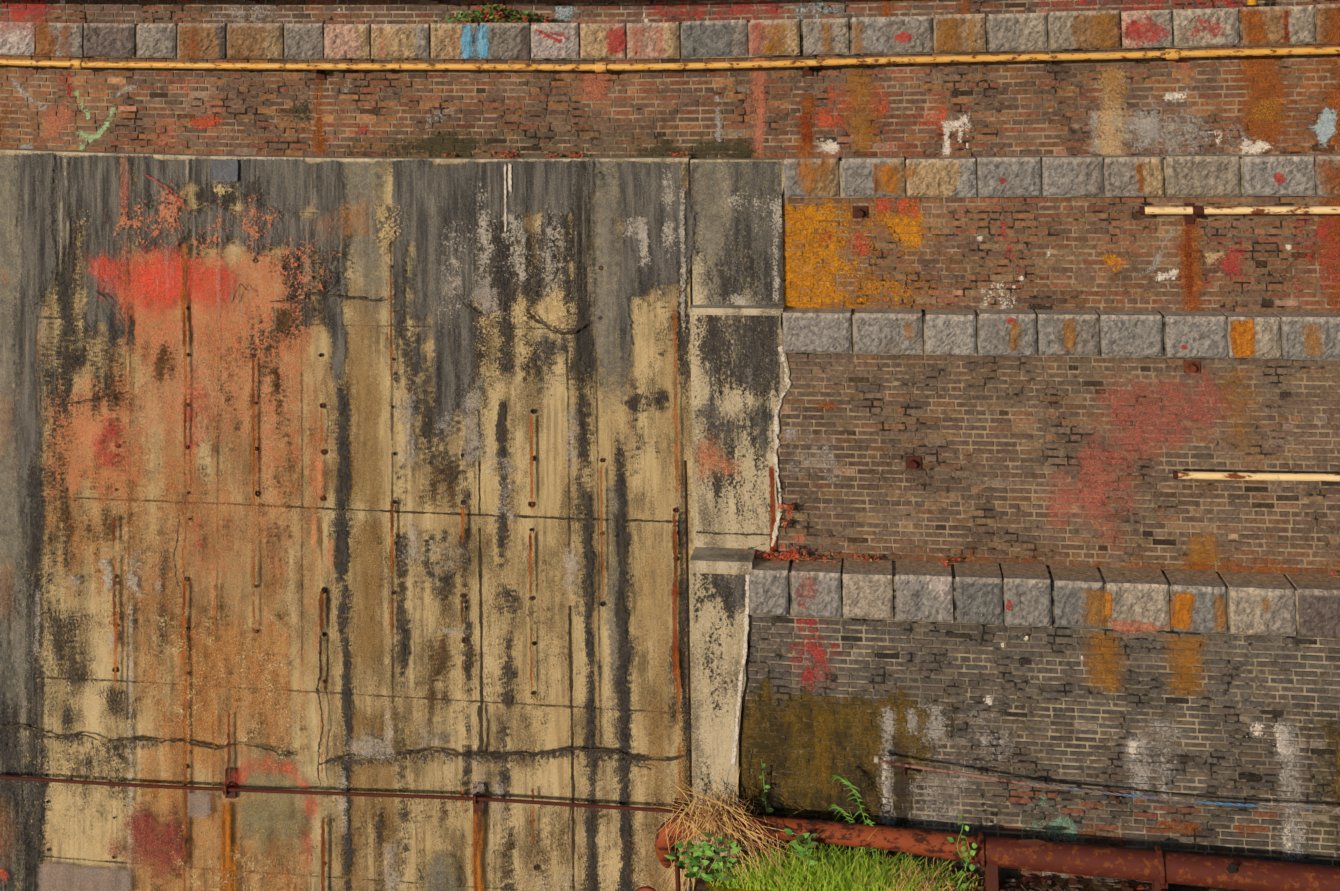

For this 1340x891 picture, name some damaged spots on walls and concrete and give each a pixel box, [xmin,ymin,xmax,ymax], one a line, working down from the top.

peeling [103,183,185,240]
peeling [217,193,341,311]
rust [1177,216,1206,311]
rust [163,509,187,891]
rust [211,712,237,891]
crack [0,636,684,786]
rust [461,789,484,891]
water stain [756,698,1008,834]
water stain [1124,721,1182,801]
water stain [1246,721,1306,860]